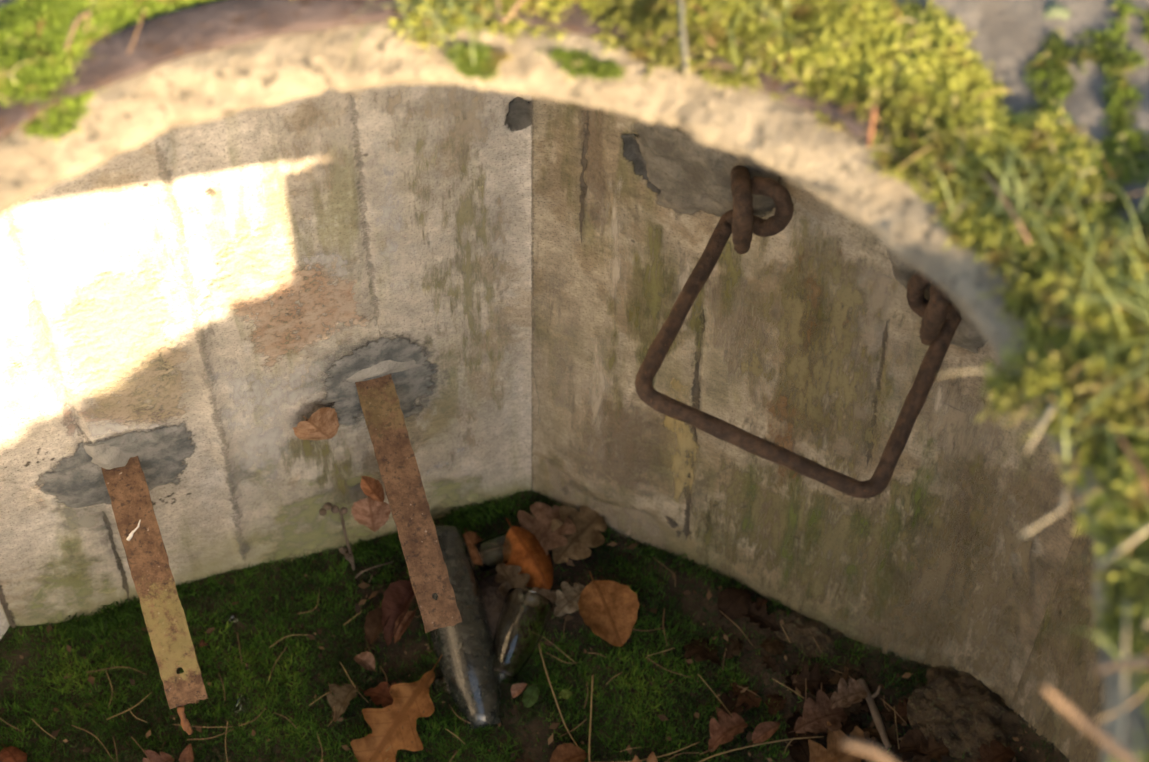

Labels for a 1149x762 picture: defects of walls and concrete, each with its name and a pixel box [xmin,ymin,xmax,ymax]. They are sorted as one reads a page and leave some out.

spalling [621,134,660,194]
damp [607,204,620,313]
damp [590,252,650,428]
damp [670,264,690,290]
damp [684,241,772,399]
rust [663,415,699,503]
damp [845,439,1104,762]